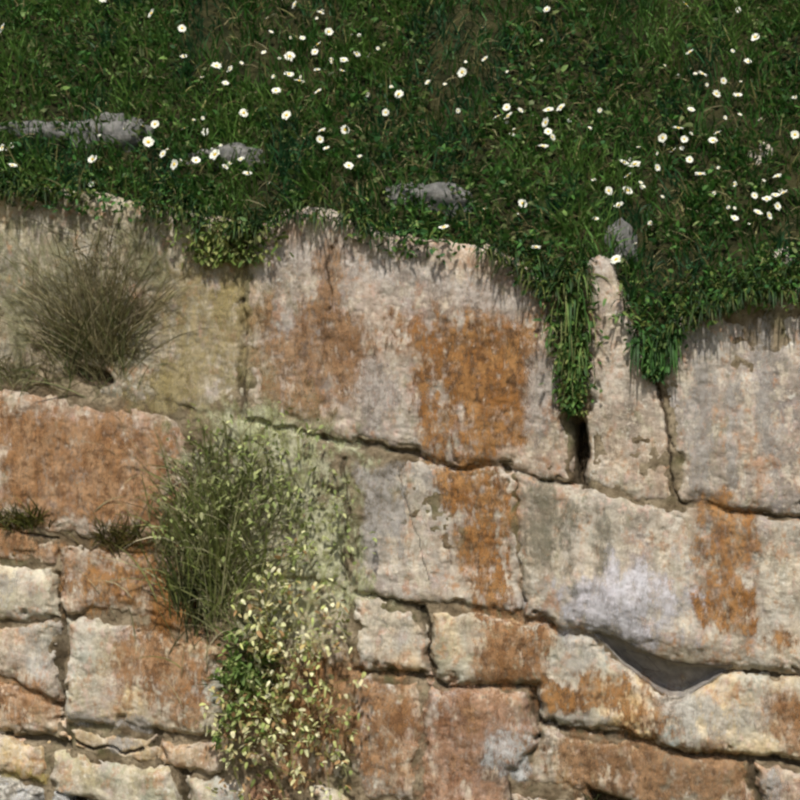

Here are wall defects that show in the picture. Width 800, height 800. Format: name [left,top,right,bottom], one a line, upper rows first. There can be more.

crack [398,474,431,584]
crack [76,740,144,755]